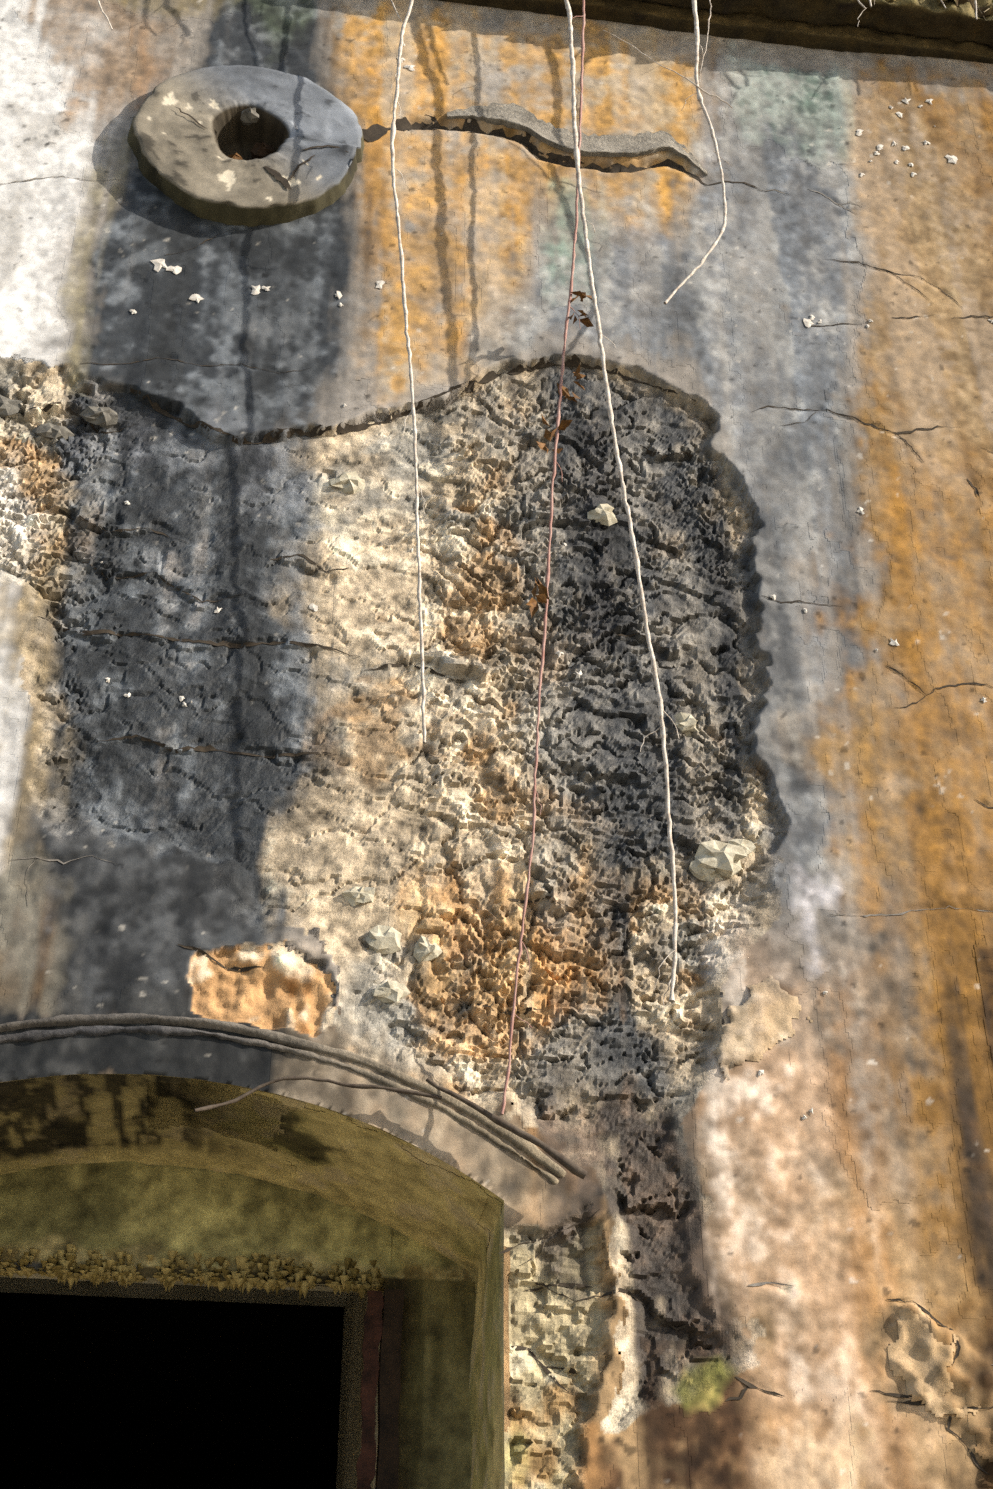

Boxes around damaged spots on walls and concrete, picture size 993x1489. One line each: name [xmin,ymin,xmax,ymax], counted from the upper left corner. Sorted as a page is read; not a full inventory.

rust [345,0,717,422]
crack [264,114,862,215]
crack [812,259,993,326]
rust [844,53,993,216]
spalling [0,358,189,544]
spalling [587,504,617,526]
crack [752,405,947,461]
water stain [0,0,551,1293]
spalling [39,399,541,1105]
spalling [689,839,758,890]
rust [526,256,993,1489]
crack [870,1298,993,1475]